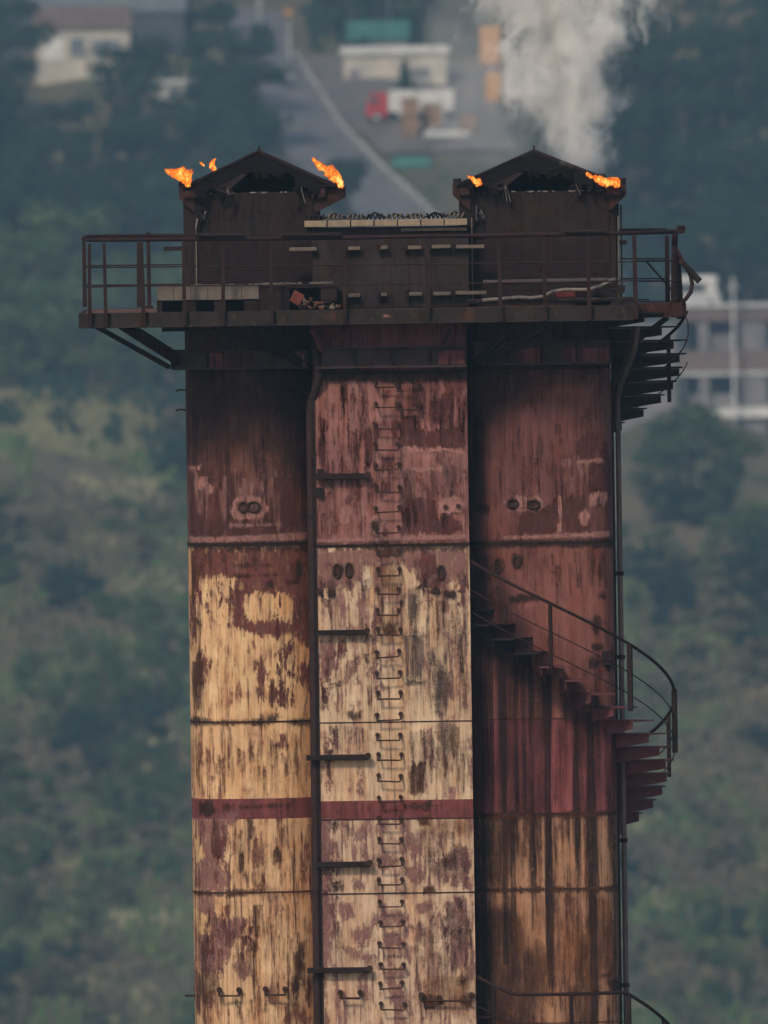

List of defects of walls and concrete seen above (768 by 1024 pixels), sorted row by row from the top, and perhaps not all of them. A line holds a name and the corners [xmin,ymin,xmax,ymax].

rust [230,473,269,521]
rust [504,494,544,513]
peeling [188,383,469,716]
rust [191,655,310,726]
rust [199,800,290,859]
rust [194,848,262,968]
peeling [321,817,473,1024]
rust [474,884,617,897]
rust [291,933,313,1005]